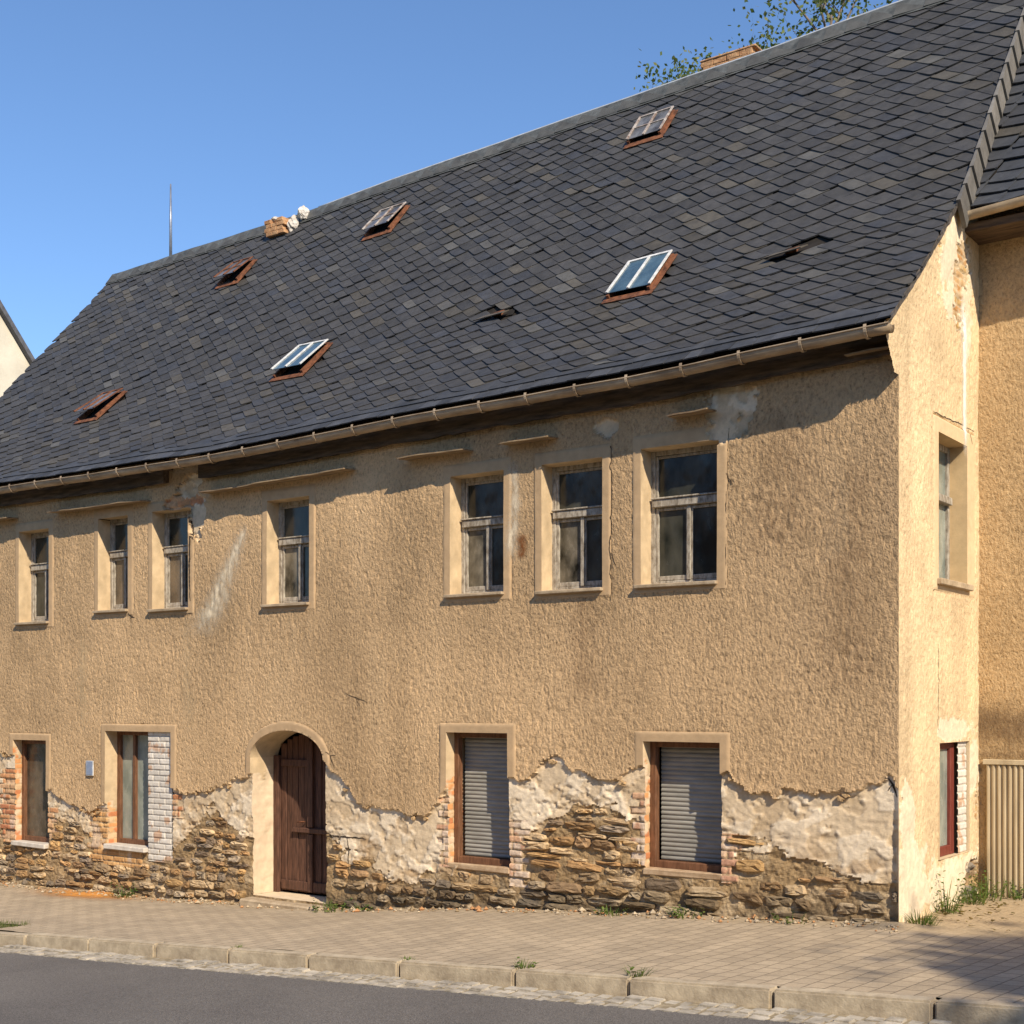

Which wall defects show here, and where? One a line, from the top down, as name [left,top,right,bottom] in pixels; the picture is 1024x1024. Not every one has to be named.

flaking render [938,208,974,359]
flaking render [704,384,760,443]
flaking render [164,473,206,541]
water stain [199,531,245,628]
flaking render [0,752,979,923]